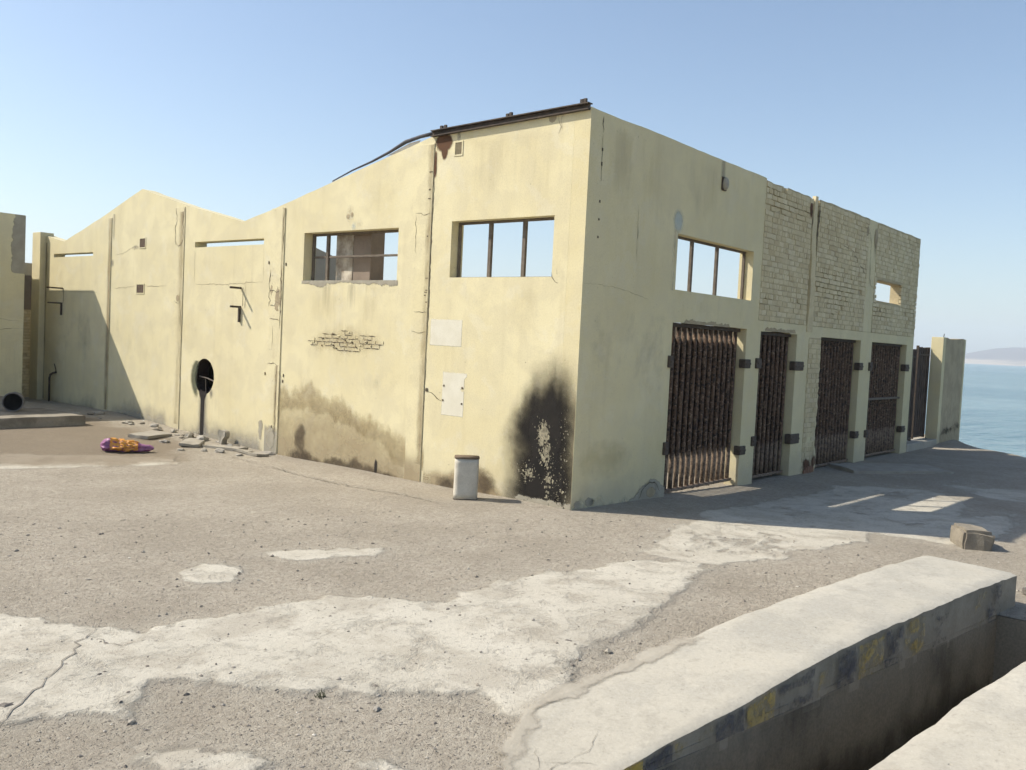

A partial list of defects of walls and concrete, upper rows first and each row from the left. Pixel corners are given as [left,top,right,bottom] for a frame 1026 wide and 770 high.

rust [434,135,452,176]
leakage [277,424,454,488]
leakage [478,473,497,496]
spalling [655,615,1026,770]